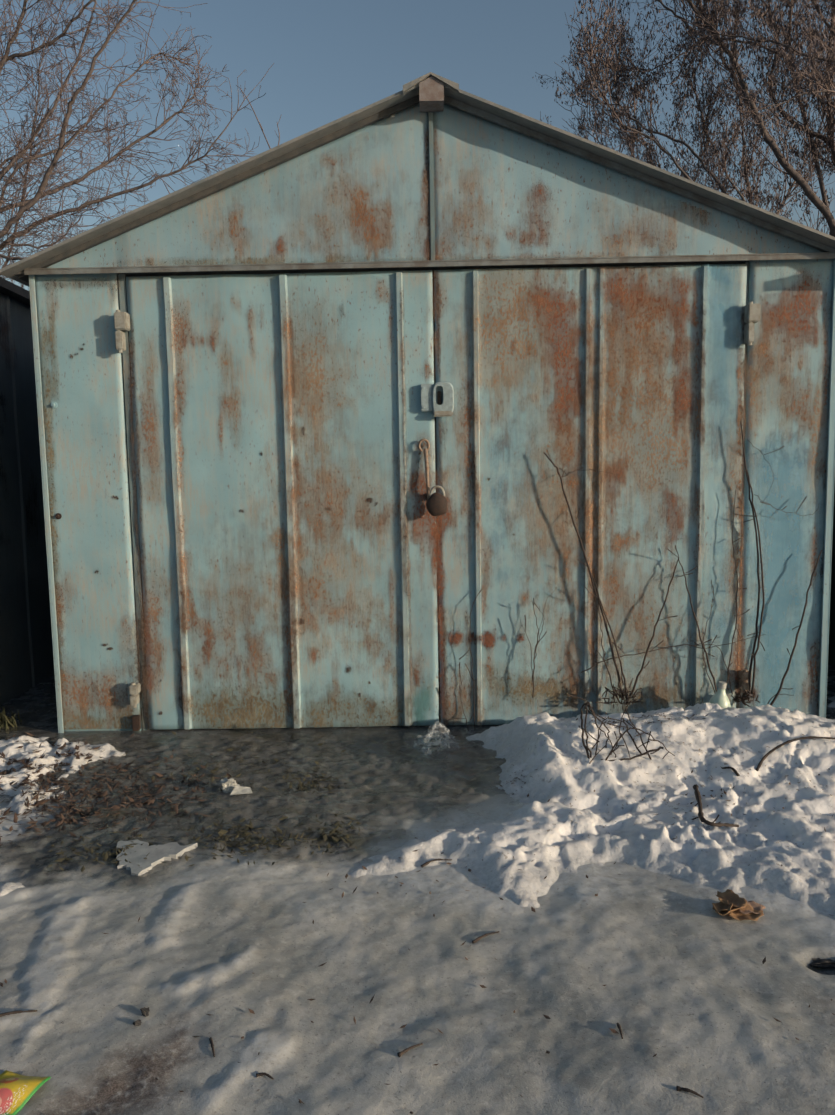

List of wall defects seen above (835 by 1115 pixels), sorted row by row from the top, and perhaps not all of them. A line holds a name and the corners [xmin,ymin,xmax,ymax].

rust [293,157,393,255]
rust [60,304,396,720]
rust [409,125,706,725]
rust [726,271,829,697]